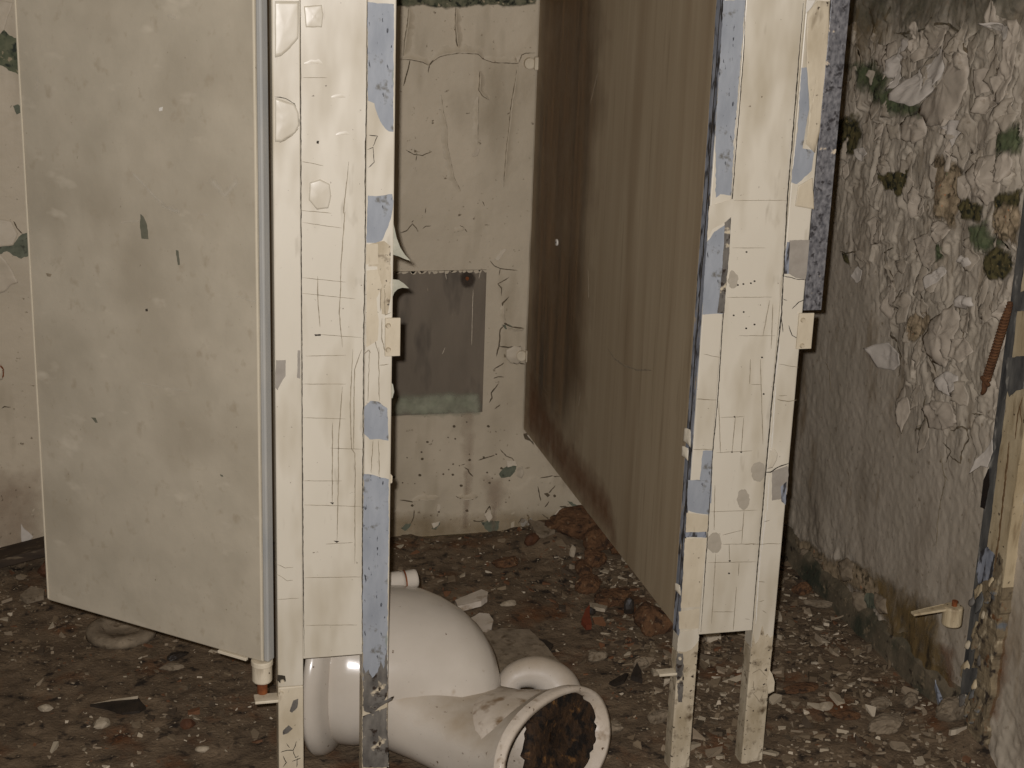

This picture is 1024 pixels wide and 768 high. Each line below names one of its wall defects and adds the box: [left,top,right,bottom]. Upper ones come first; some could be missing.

spalling [0,0,18,74]
peeling [367,2,394,132]
crack [400,8,529,175]
peeling [791,0,830,209]
water stain [853,63,919,115]
peeling [839,0,1022,252]
spalling [0,219,28,293]
peeling [366,194,410,315]
crack [489,261,524,409]
peeling [863,256,947,434]
peeling [959,237,1024,397]
peeling [362,474,415,768]